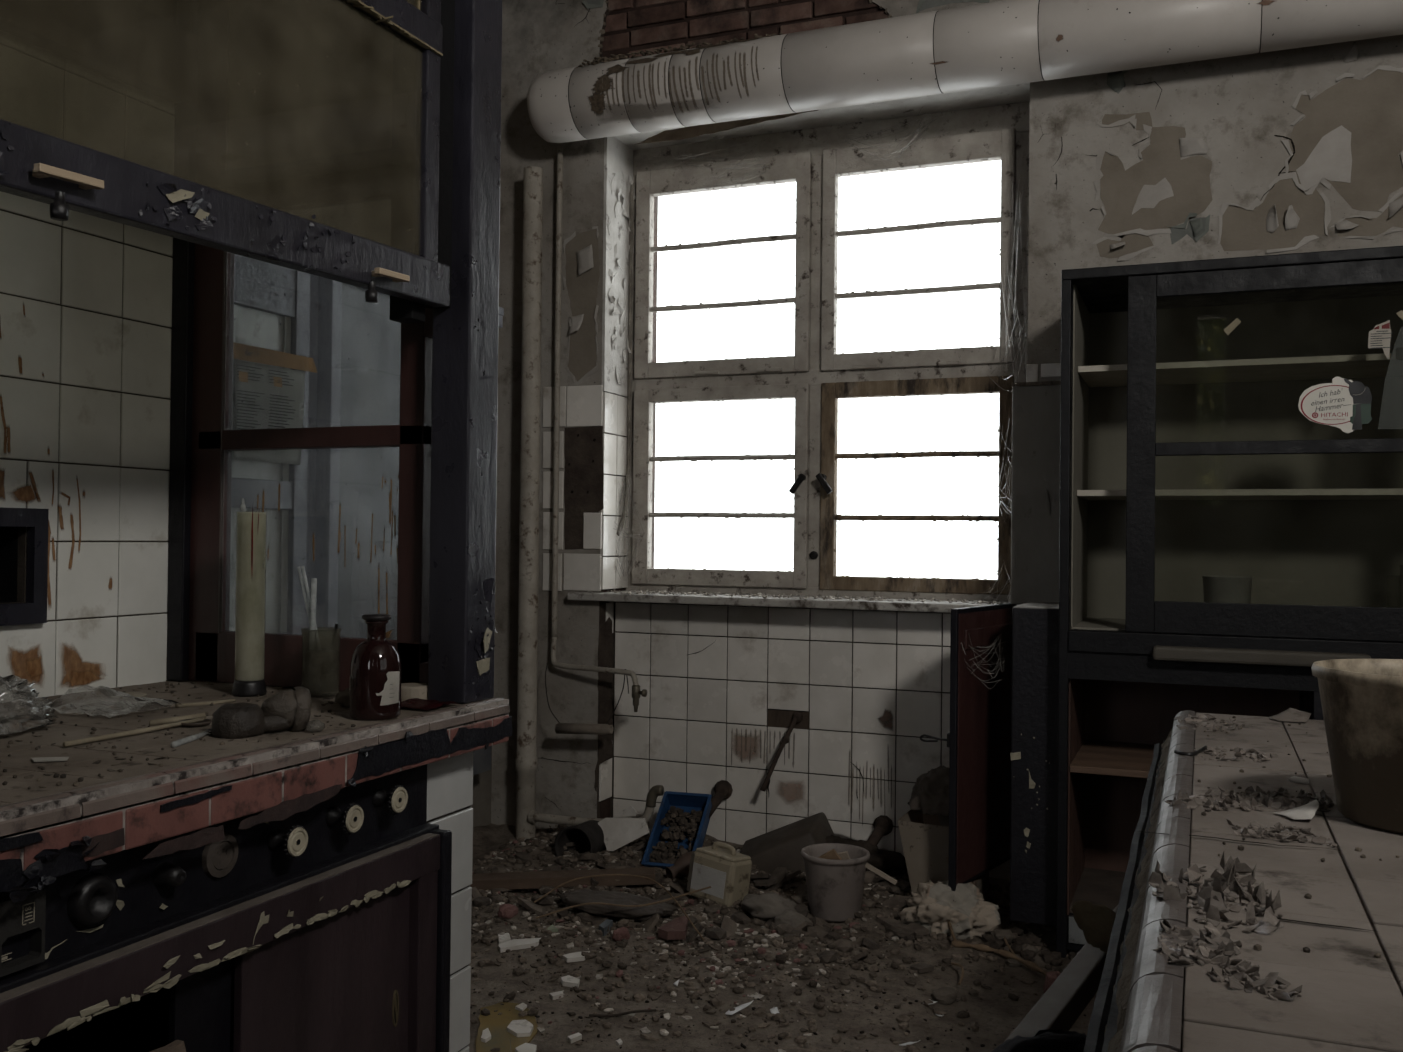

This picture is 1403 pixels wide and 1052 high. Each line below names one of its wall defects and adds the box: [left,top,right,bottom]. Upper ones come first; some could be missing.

flaking render [598,0,892,63]
peeling [1091,44,1403,261]
corrosion [0,395,85,606]
leakage [878,710,893,730]
peeling [1173,714,1278,763]
leakage [848,747,892,824]
peeling [1165,786,1338,847]